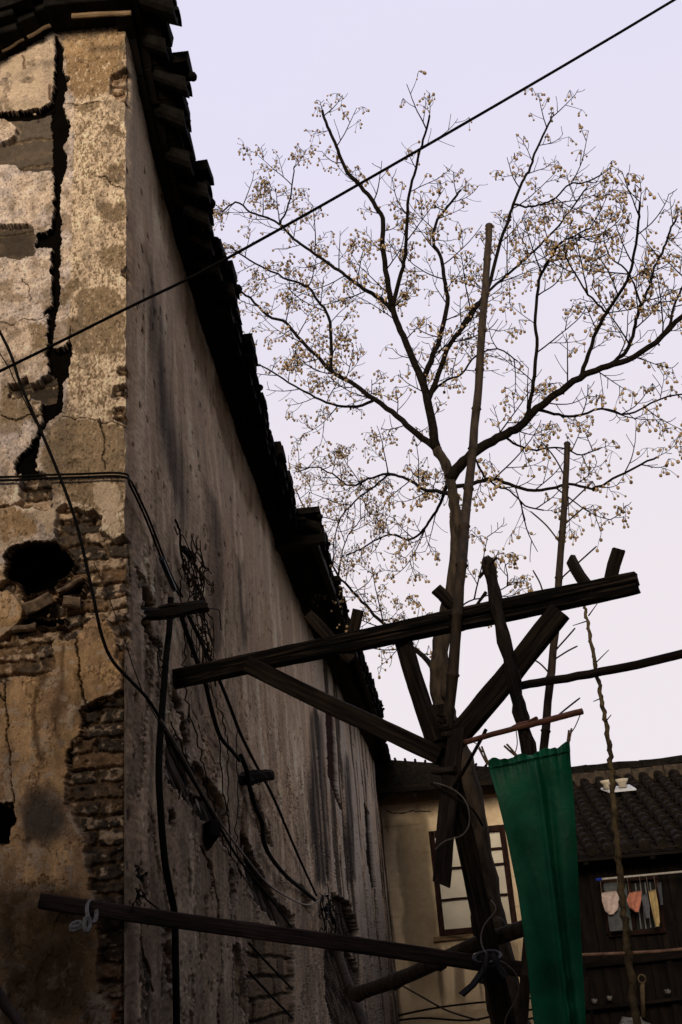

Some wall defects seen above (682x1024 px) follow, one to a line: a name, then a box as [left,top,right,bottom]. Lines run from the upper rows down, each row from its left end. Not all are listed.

spalling [0,222,39,260]
spalling [0,113,54,174]
crack [0,36,99,481]
crack [96,175,125,189]
spalling [0,468,129,683]
crack [0,682,16,803]
spalling [0,801,17,846]
damp [24,793,61,839]
spalling [64,692,127,905]
damp [310,708,329,885]
damp [344,756,355,883]
spalling [84,918,126,1024]